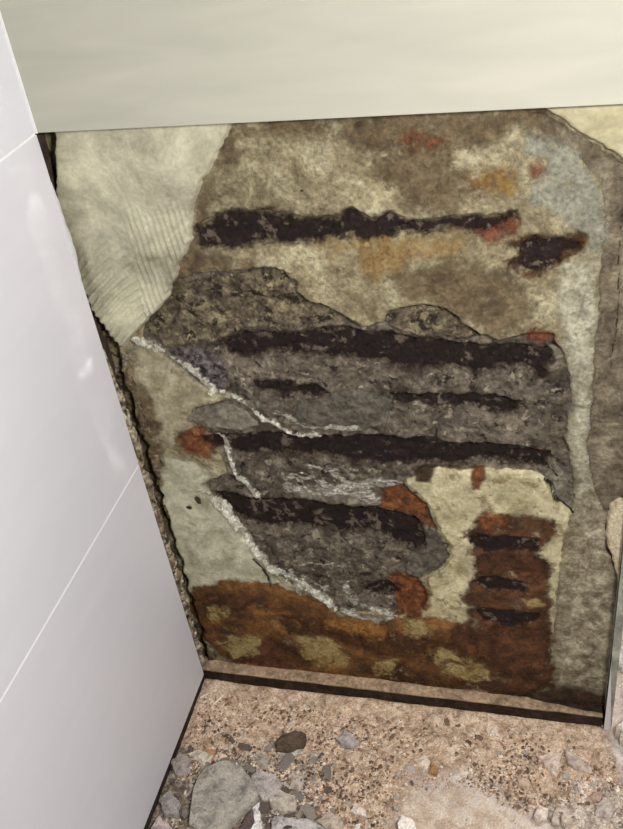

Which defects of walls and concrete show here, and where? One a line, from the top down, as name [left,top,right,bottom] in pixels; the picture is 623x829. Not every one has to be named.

rust [194,206,521,279]
rust [218,325,555,381]
rust [254,379,330,398]
spalling [116,113,623,697]
rust [389,391,527,414]
rust [175,426,550,490]
rust [215,485,435,551]
crack [252,558,271,586]
rust [190,511,557,696]